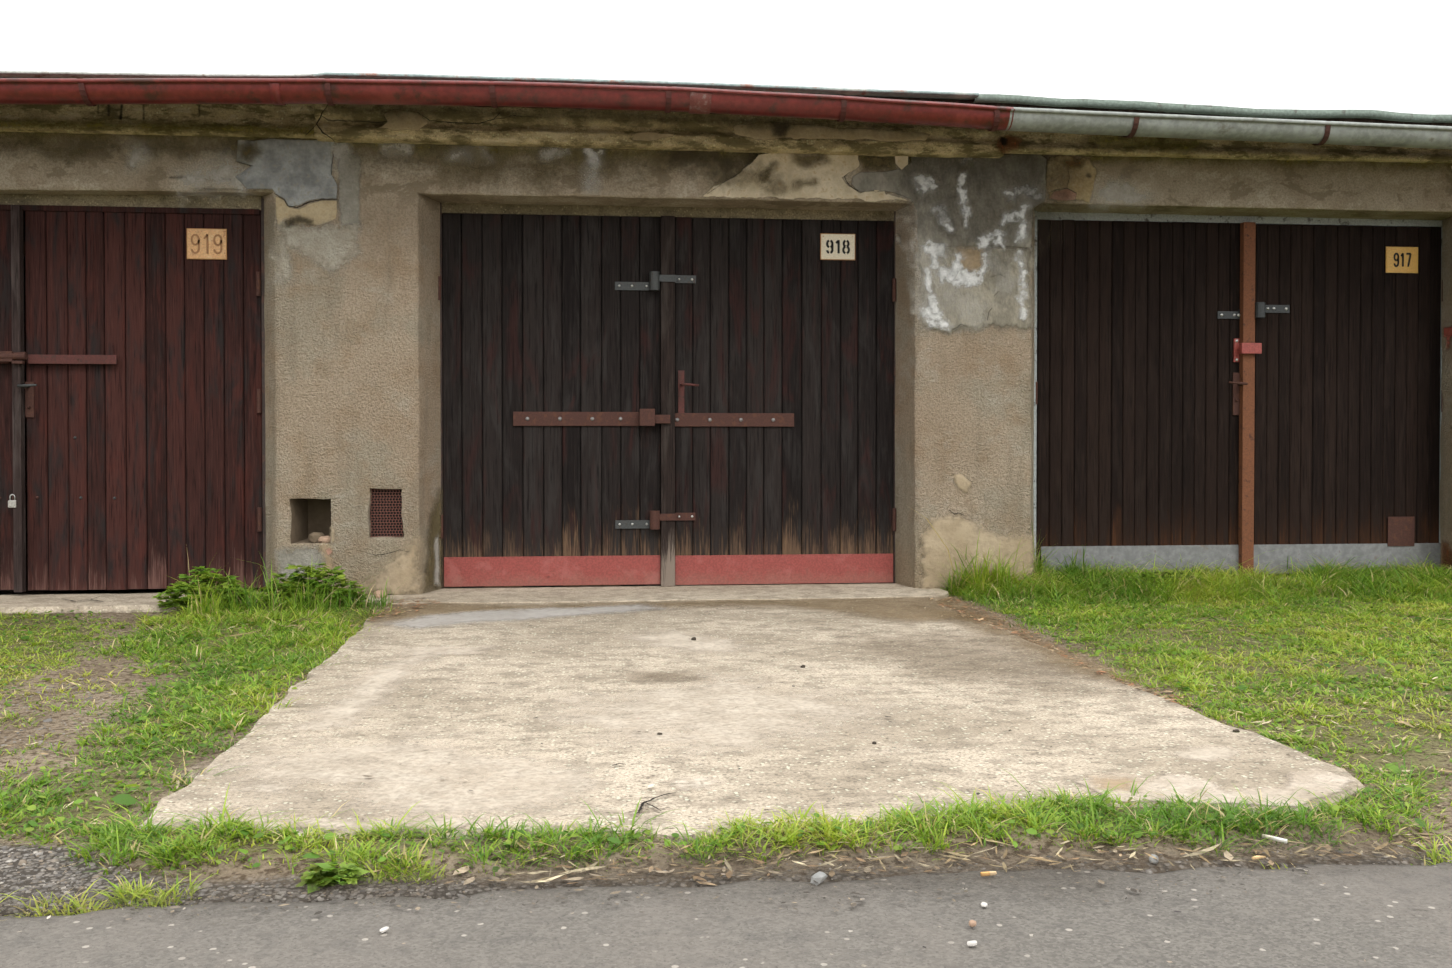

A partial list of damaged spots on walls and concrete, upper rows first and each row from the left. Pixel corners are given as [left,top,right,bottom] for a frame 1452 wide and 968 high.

peeling [236,139,346,226]
water stain [377,494,1011,635]